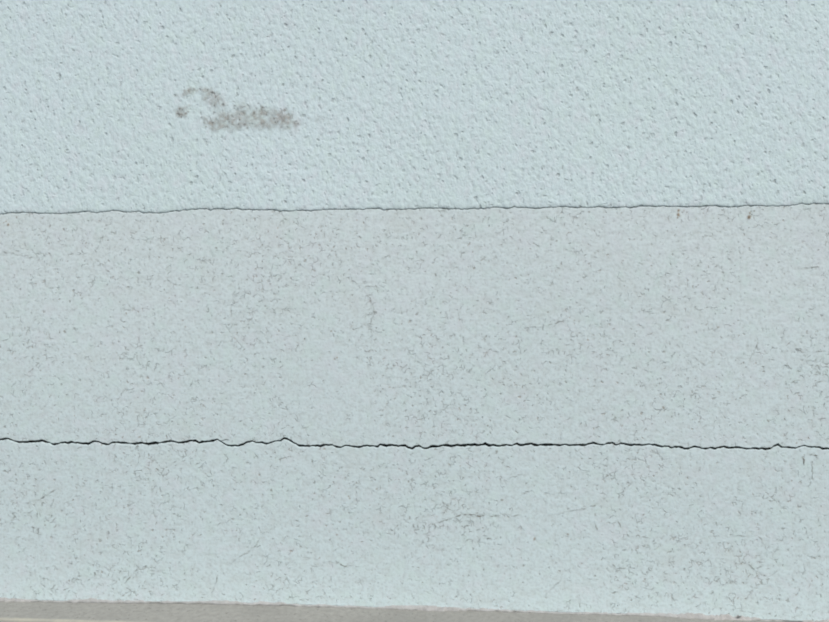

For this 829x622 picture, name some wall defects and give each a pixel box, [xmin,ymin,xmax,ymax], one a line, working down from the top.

crack [0,437,829,464]